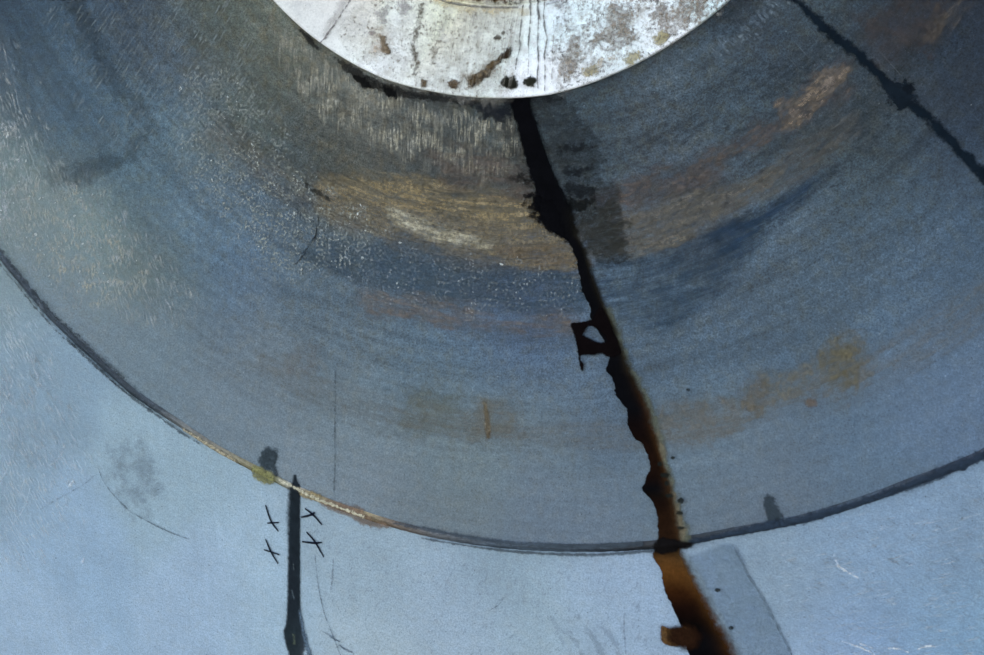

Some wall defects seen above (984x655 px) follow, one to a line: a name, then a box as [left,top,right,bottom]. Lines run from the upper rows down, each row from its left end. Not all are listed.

rust [662,66,849,191]